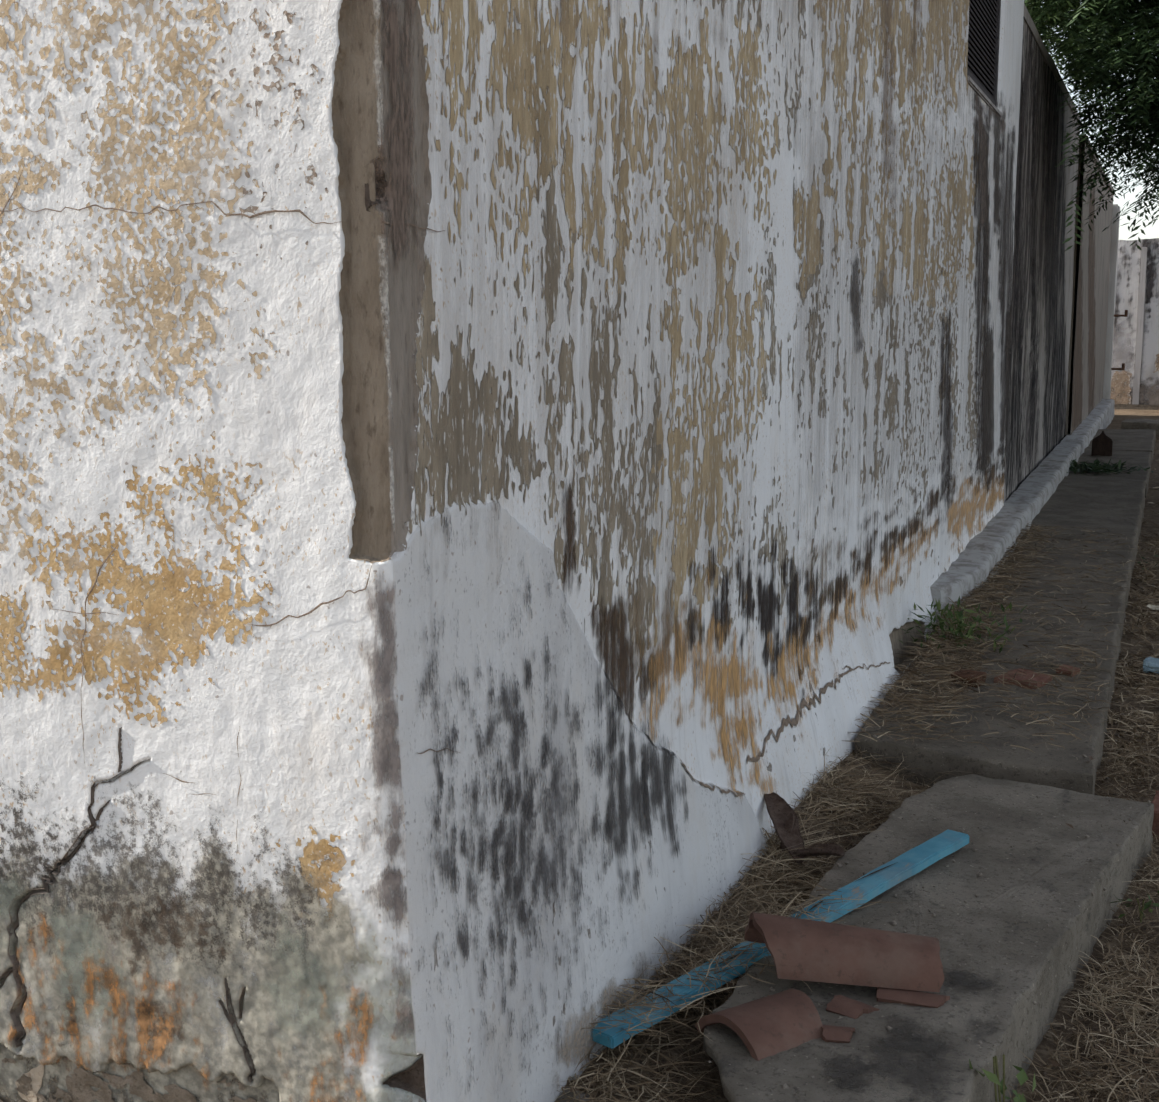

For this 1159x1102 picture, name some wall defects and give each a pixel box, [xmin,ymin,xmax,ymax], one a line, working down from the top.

water stain [1114,238,1159,334]
spalling [0,0,987,728]
water stain [1123,380,1159,405]
water stain [419,0,1096,1041]
crack [249,561,374,627]
crack [0,538,242,1048]
water stain [361,581,402,789]
crack [680,662,890,797]
water stain [0,779,423,1102]
water stain [557,921,697,1067]
spalling [0,1047,197,1102]
spalling [383,1056,426,1102]